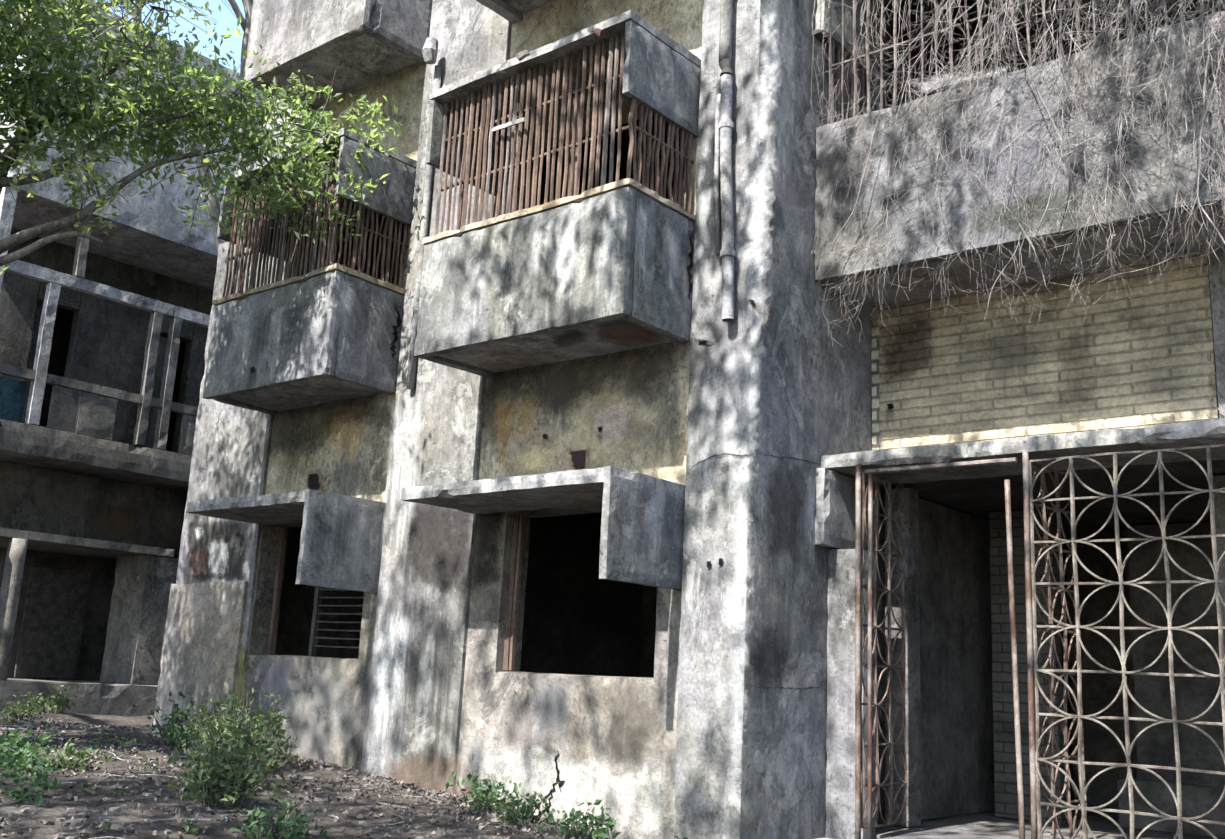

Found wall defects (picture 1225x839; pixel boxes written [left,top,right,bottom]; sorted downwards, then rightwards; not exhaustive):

water stain [403,506,503,589]
water stain [353,651,375,763]
water stain [431,624,450,711]